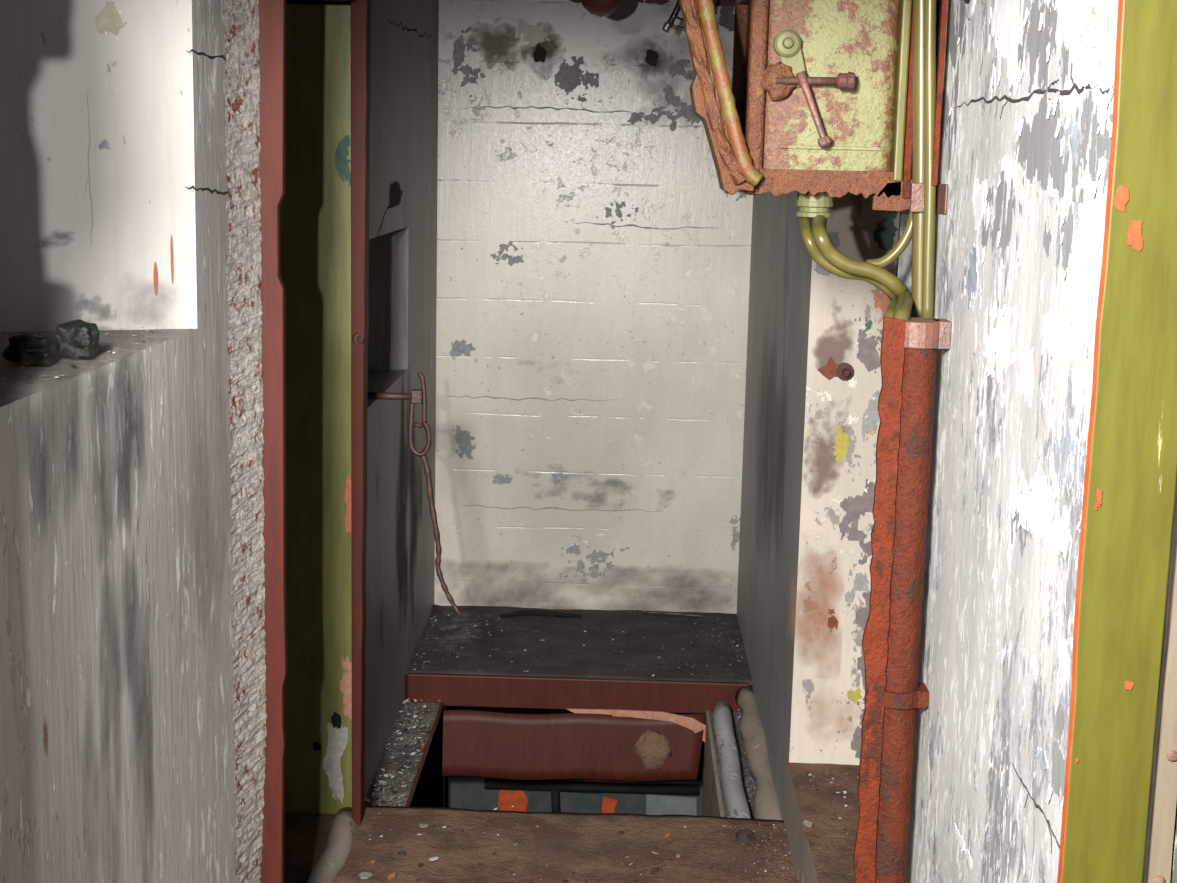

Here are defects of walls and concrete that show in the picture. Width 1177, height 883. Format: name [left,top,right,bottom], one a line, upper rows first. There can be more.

water stain [470,31,518,65]
water stain [531,35,558,57]
peeling [939,0,976,170]
crack [954,63,1113,119]
peeling [960,0,1143,408]
peeling [856,329,882,373]
spalling [223,0,267,883]
peeling [839,478,875,631]
peeling [862,390,880,465]
peeling [1011,415,1084,558]
peeling [313,656,352,803]
crack [1012,763,1060,854]